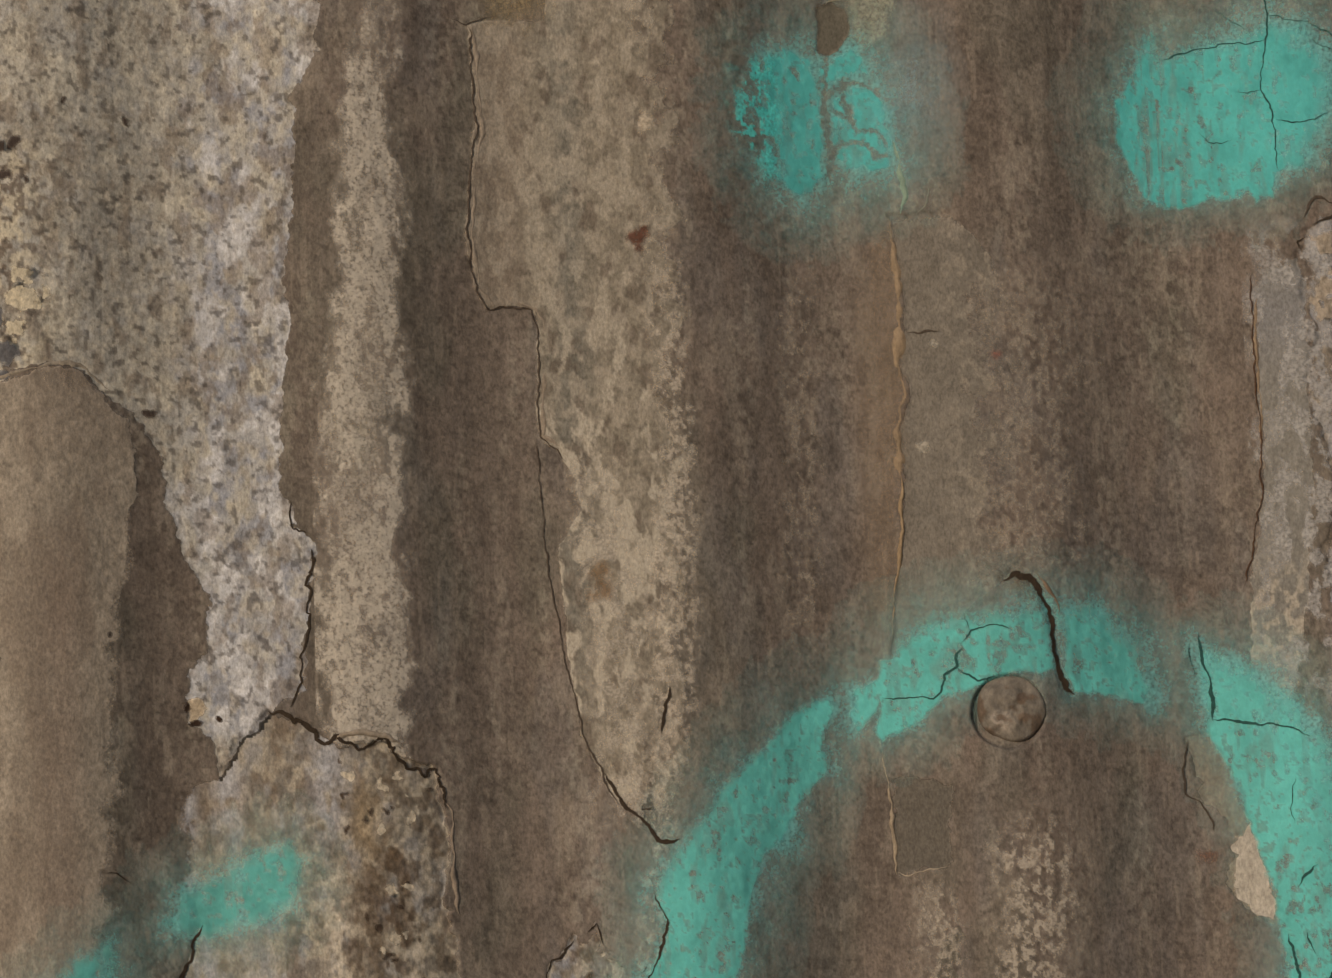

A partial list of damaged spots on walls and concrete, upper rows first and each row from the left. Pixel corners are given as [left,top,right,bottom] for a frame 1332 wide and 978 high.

peeling [816,0,894,56]
crack [1165,0,1332,170]
peeling [0,0,461,978]
peeling [464,0,697,811]
peeling [1242,216,1332,700]
crack [885,618,1011,700]
crack [1002,571,1075,695]
crack [1188,634,1309,736]
crack [1181,743,1214,830]
peeling [1185,731,1279,926]
spalling [547,922,624,978]